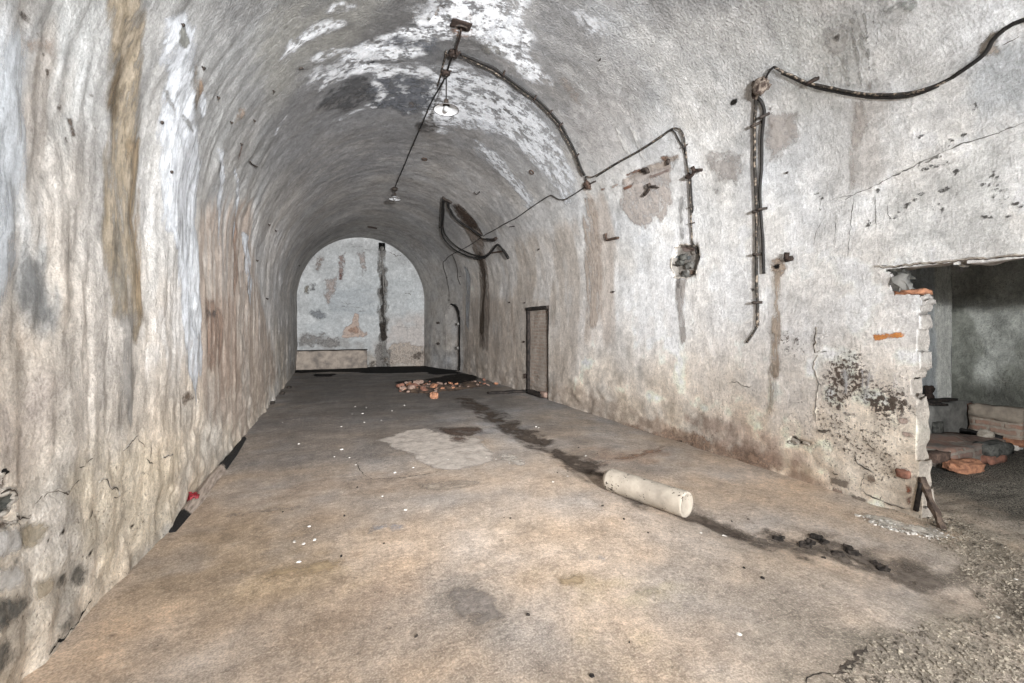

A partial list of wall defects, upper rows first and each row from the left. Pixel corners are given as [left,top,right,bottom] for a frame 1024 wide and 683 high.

water stain [281,2,354,59]
water stain [311,0,577,207]
water stain [102,0,145,427]
flaking render [601,155,678,226]
crack [814,122,1024,250]
spalling [670,243,701,279]
spalling [888,268,916,292]
flaking render [342,313,367,338]
crack [813,327,827,416]
water stain [813,351,914,482]